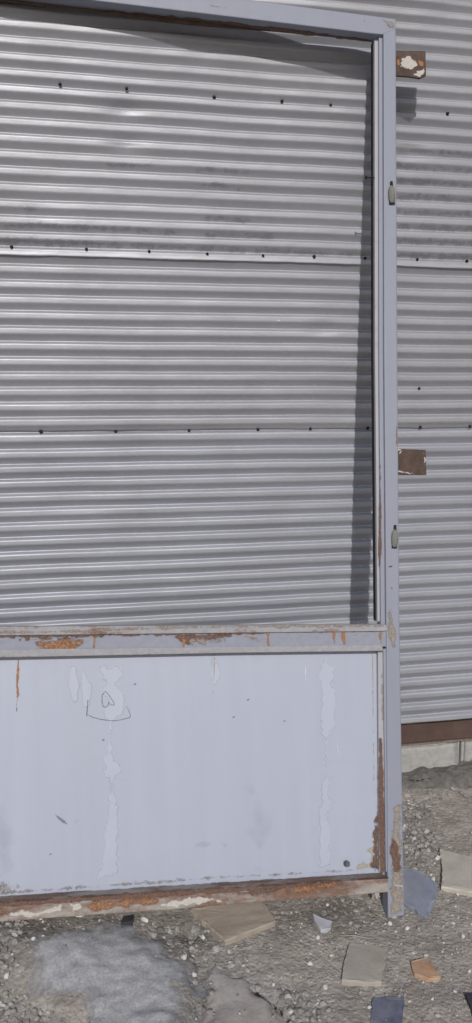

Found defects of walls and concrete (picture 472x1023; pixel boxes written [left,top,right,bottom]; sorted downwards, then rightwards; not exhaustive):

rust [0,632,270,649]
rust [357,738,388,880]
rust [0,880,342,915]